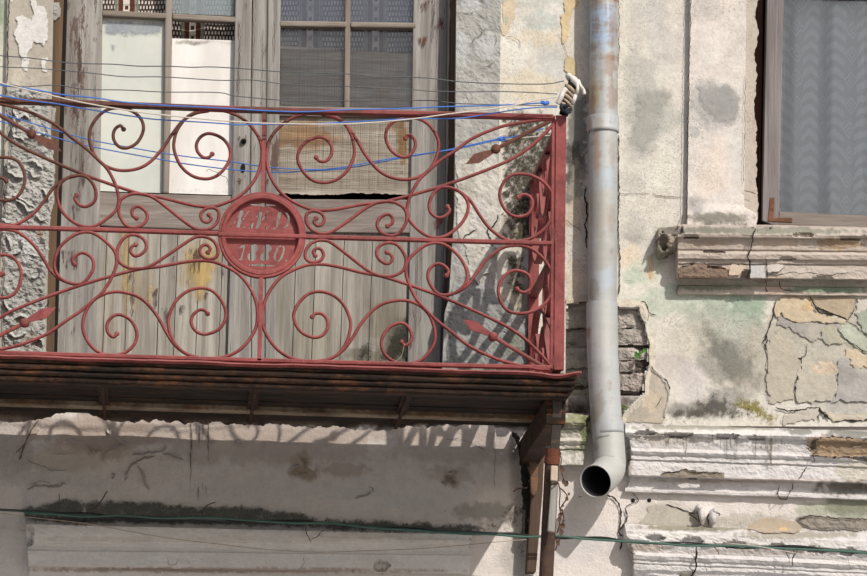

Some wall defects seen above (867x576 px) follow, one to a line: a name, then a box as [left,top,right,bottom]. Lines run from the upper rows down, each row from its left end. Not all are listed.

peeling [14,0,61,72]
water stain [699,84,739,121]
water stain [502,112,551,239]
water stain [504,252,525,310]
flaking render [561,294,589,396]
flaking render [617,299,670,425]
crack [747,228,867,422]
peeling [765,296,867,425]
flaking render [811,437,867,457]
water stain [83,500,483,533]
crack [607,493,639,550]
crack [666,504,720,526]